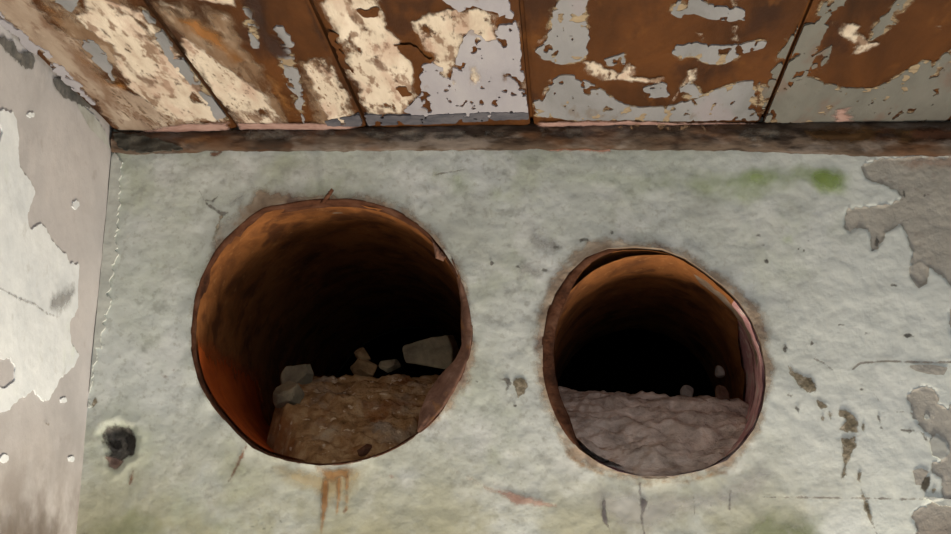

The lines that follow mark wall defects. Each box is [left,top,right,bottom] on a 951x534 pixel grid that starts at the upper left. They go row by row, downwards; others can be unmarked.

peeling [273,0,951,141]
peeling [0,0,292,413]
peeling [844,156,951,288]
flaking render [103,426,136,469]
corrosion [292,470,358,527]
flaking render [789,367,865,478]
crack [786,494,915,502]
crack [852,360,951,370]
peeling [901,386,951,534]
peeling [910,364,947,375]